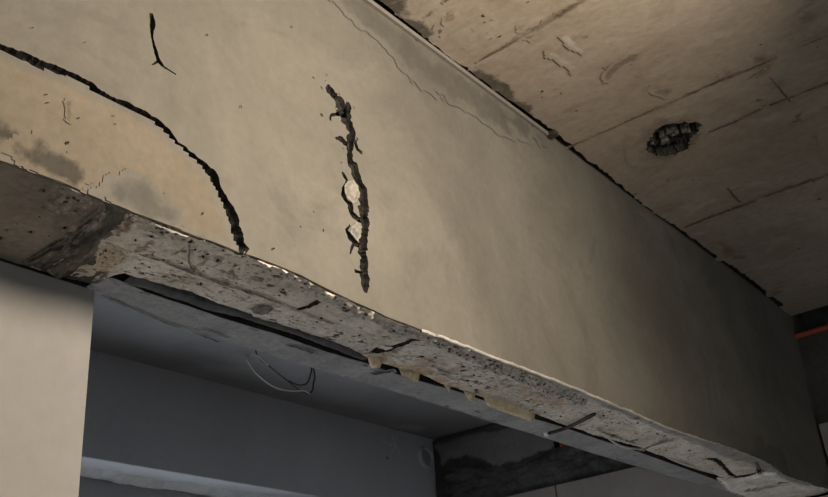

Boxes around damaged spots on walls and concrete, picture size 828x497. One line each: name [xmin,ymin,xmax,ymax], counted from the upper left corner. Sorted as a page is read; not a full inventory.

crack [150,13,176,75]
spalling [22,182,224,284]
crack [0,44,249,255]
crack [313,74,370,293]
spalling [645,121,702,157]
spalling [242,255,591,408]
spalling [717,472,825,497]